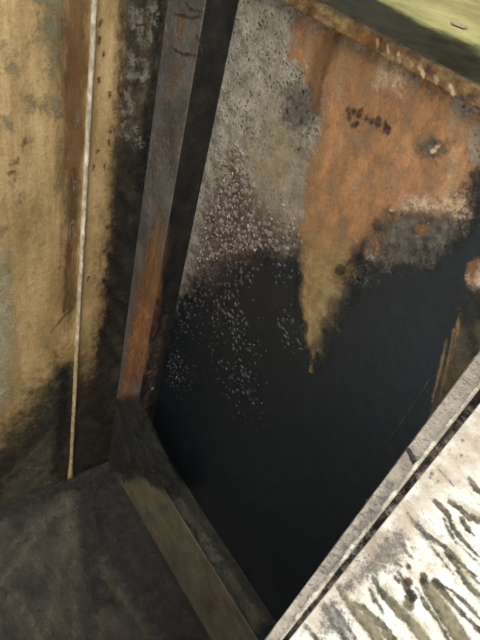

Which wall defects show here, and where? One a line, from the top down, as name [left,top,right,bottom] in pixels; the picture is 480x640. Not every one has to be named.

rust [281,16,480,269]
rust [119,214,163,401]
rust [466,260,480,291]